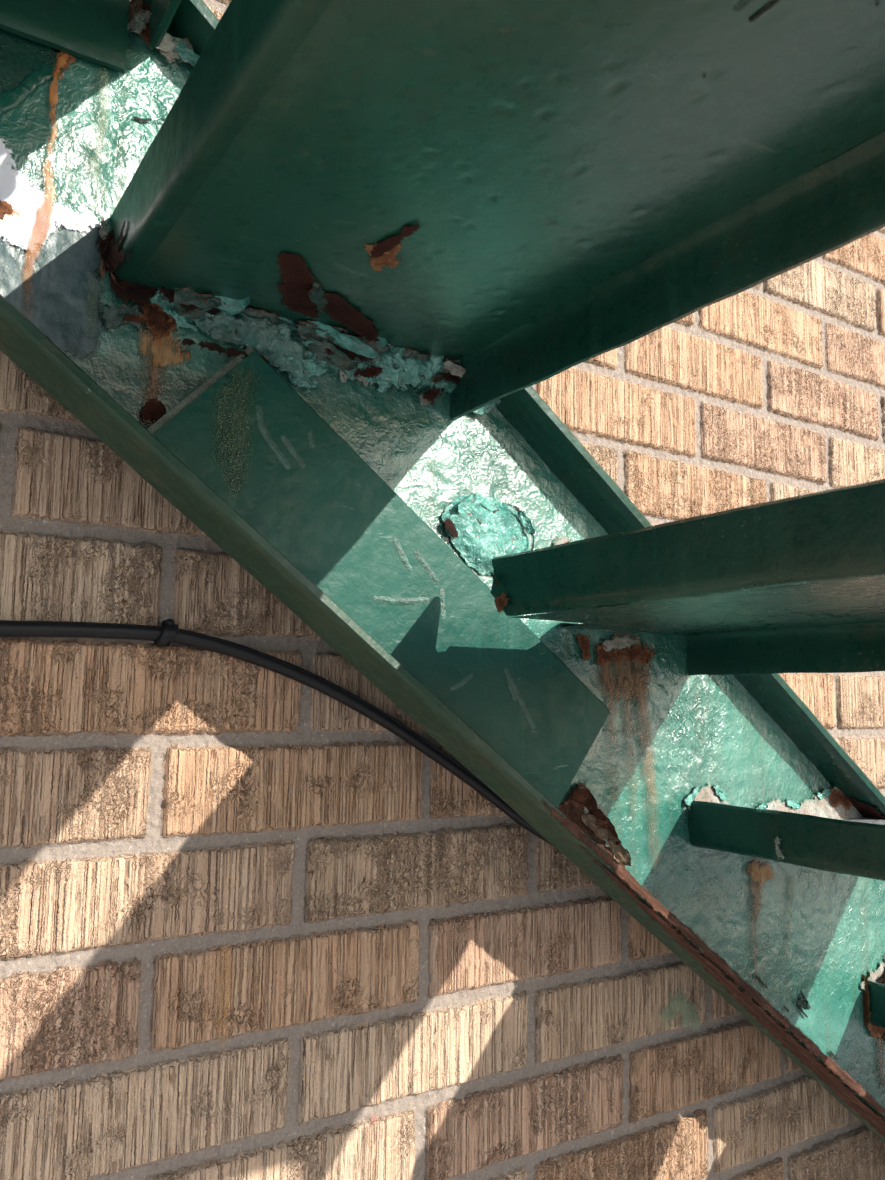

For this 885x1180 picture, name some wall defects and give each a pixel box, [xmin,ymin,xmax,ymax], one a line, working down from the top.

rust [0,201,13,215]
rust [27,51,76,259]
peeling [0,139,466,406]
rust [364,242,402,272]
rust [101,303,191,424]
peeling [473,399,501,415]
rust [576,634,654,793]
peeling [683,782,729,810]
peeling [756,787,863,820]
rust [542,781,885,1137]